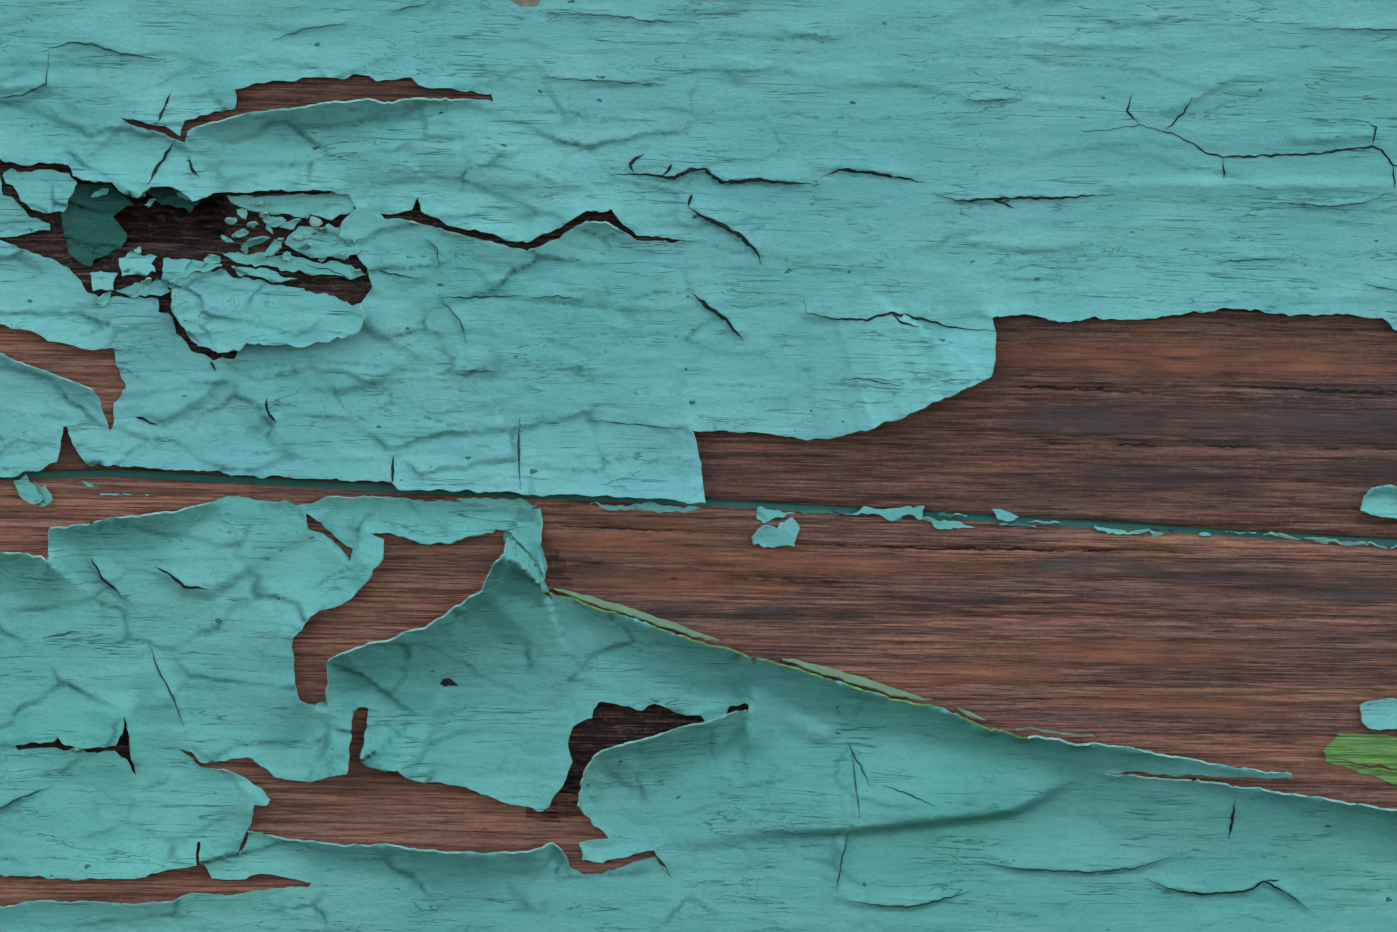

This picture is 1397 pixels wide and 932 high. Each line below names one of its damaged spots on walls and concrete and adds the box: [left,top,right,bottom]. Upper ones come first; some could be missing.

peeling [113,50,518,171]
peeling [0,168,708,439]
crack [614,153,1113,264]
crack [1083,98,1397,207]
crack [1220,256,1285,264]
peeling [0,283,1397,927]